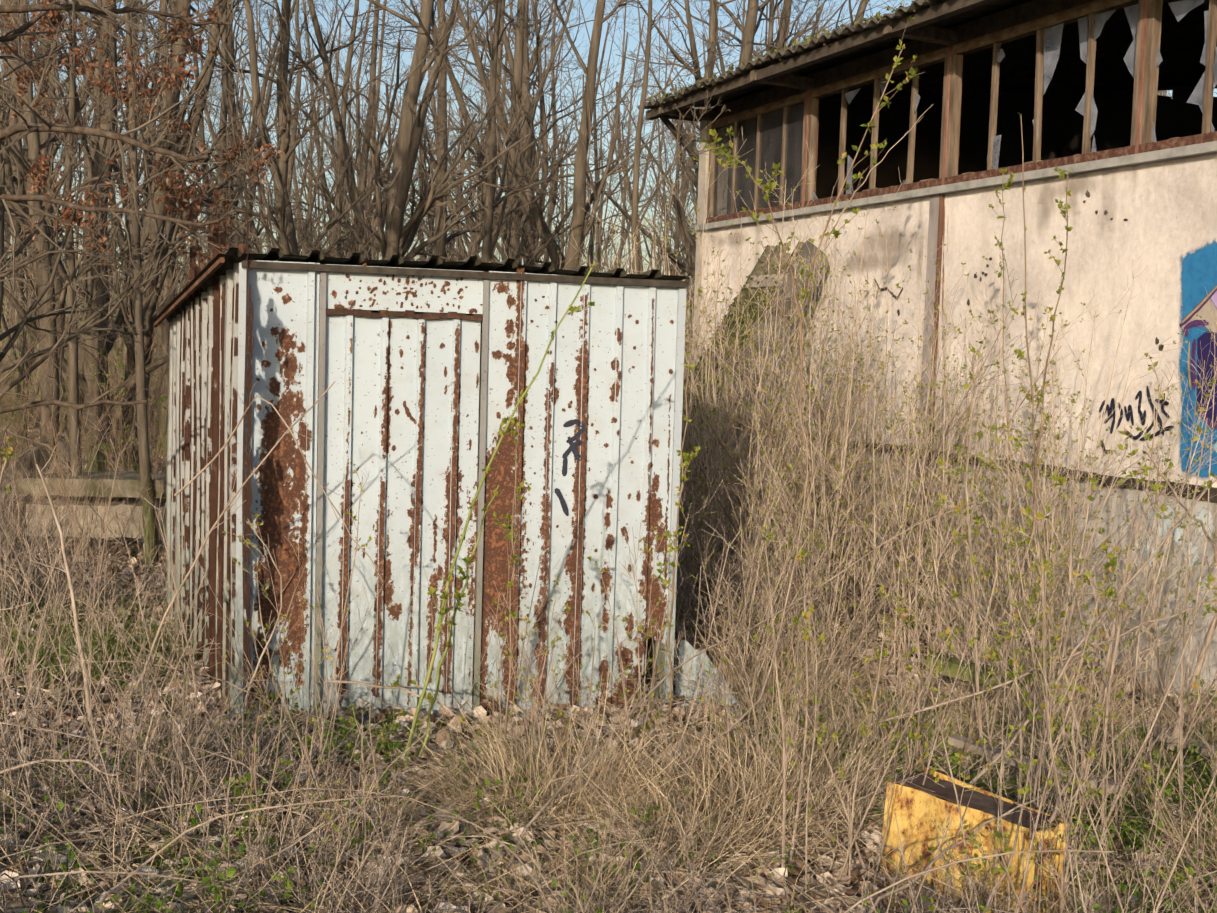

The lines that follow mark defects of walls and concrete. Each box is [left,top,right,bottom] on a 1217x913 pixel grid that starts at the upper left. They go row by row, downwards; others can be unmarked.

rust [170,189,312,720]
rust [331,263,671,719]